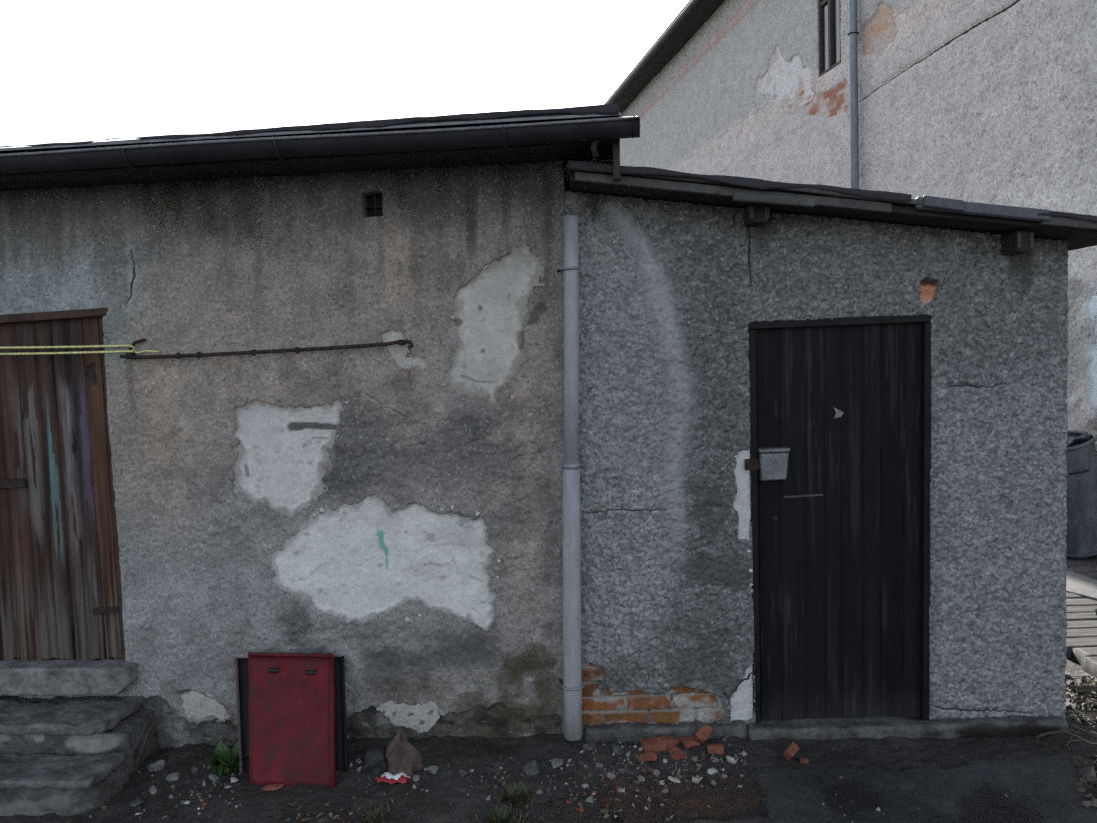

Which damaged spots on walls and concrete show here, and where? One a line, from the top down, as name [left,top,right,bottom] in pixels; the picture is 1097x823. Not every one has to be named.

flaking render [756,45,850,118]
spalling [862,2,897,56]
crack [858,0,1020,103]
crack [125,249,135,305]
spalling [919,278,943,306]
flaking render [442,246,544,404]
flaking render [232,400,501,631]
flaking render [733,449,751,552]
spalling [142,690,238,749]
spalling [346,700,563,740]
spalling [582,662,753,725]